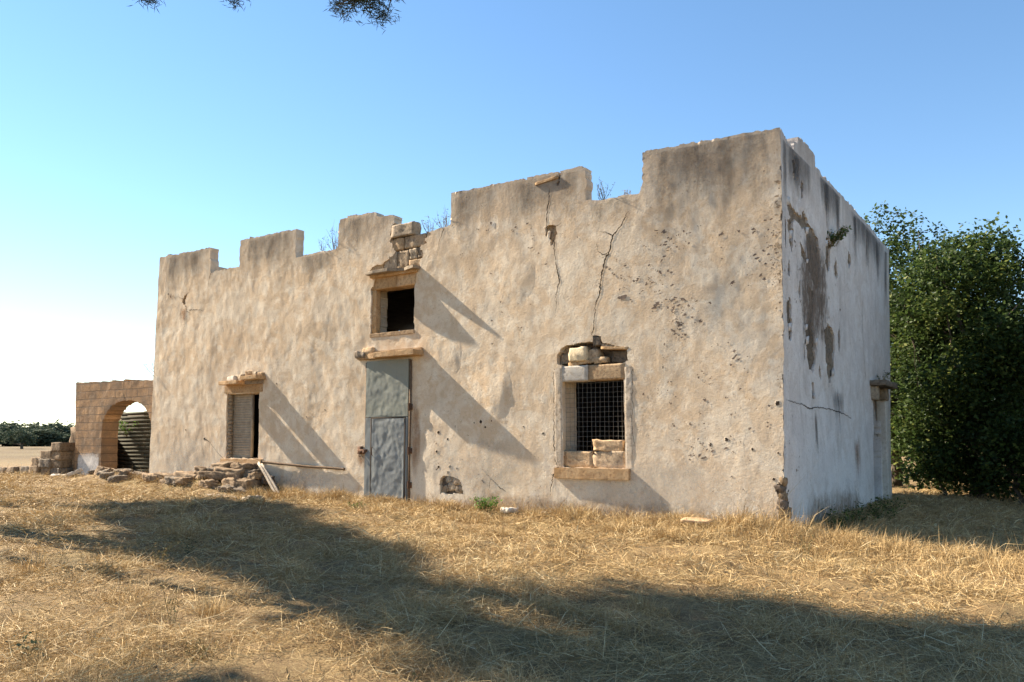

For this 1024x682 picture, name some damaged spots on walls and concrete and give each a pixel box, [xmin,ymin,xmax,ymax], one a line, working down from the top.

crack [546,191,560,316]
crack [591,213,627,335]
leakage [802,236,827,347]
crack [790,401,849,417]
spalling [435,427,463,494]
hole [678,436,754,461]
spalling [772,456,800,524]